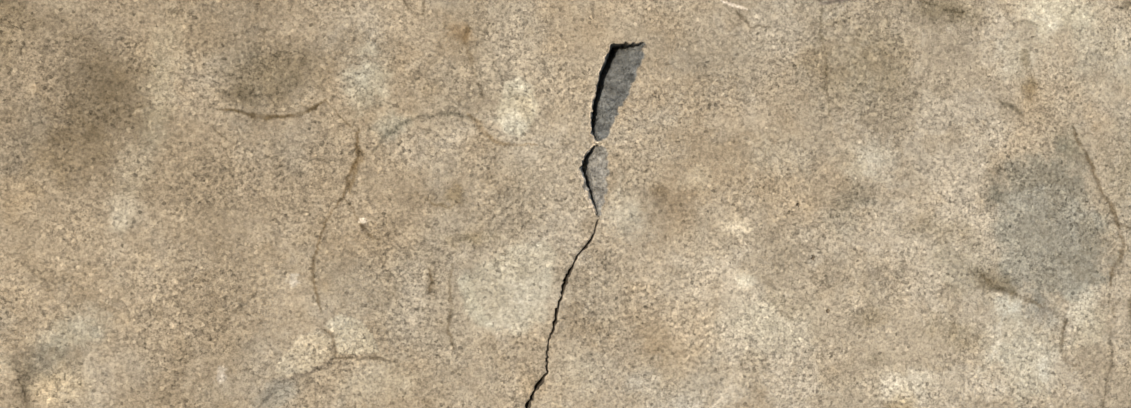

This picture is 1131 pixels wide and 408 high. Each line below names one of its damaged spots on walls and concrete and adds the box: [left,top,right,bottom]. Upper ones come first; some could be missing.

crack [522,216,601,408]